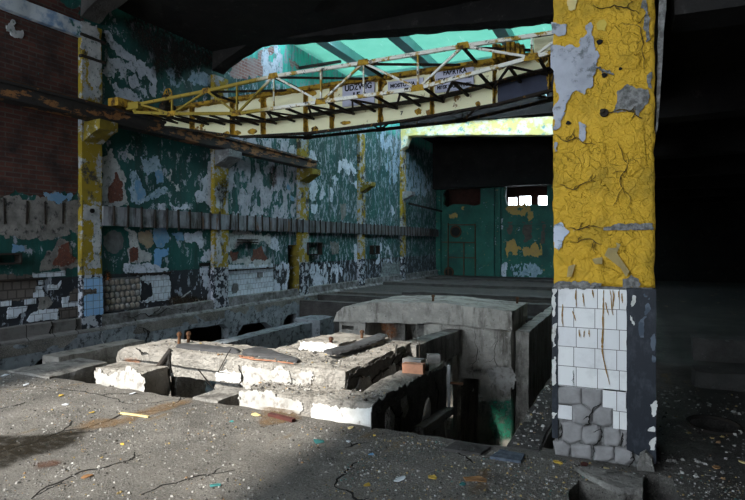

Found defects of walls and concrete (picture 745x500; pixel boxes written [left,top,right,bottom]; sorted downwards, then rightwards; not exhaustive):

flaking render [0,0,157,102]
flaking render [230,45,299,82]
peeling [551,19,607,130]
crack [593,1,650,69]
crack [609,106,642,118]
flaking render [0,102,297,301]
peeling [497,202,569,277]
corrosion [601,290,623,385]
peeling [205,364,447,436]
crack [584,405,603,456]
crack [30,452,140,500]
crack [141,468,235,495]